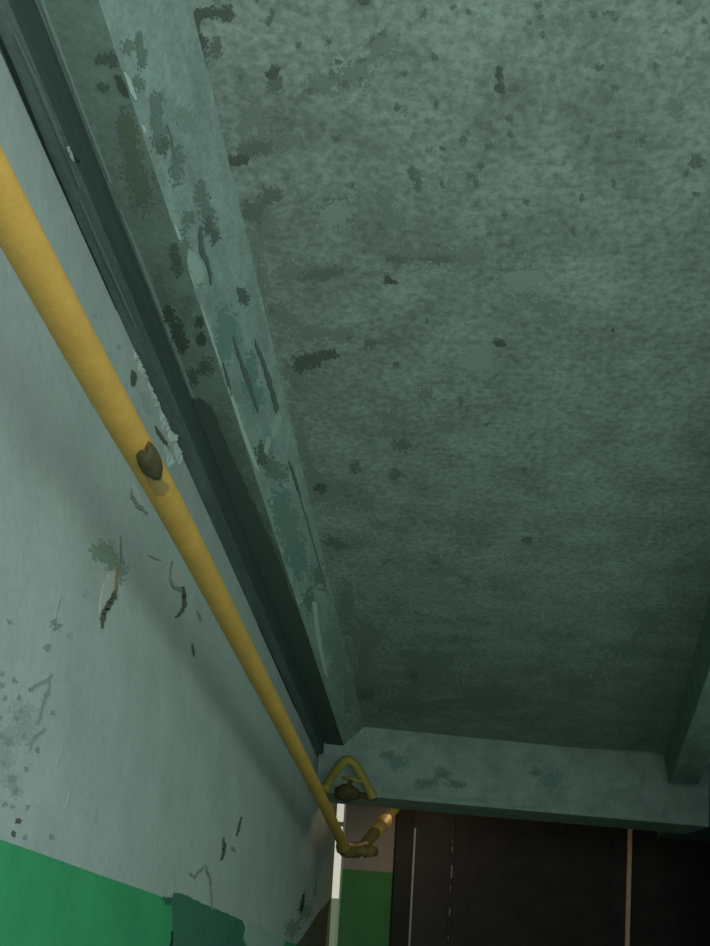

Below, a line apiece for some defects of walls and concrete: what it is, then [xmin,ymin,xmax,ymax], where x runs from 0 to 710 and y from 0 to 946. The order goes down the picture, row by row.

spalling [114,71,138,100]
flaking render [173,224,205,288]
peeling [120,210,194,398]
peeling [199,303,222,366]
flaking render [130,350,183,467]
crack [222,336,279,414]
peeling [226,386,282,471]
peeling [99,570,119,614]
crack [99,535,123,629]
crack [147,555,202,621]
crack [28,674,54,753]
crack [189,817,242,911]